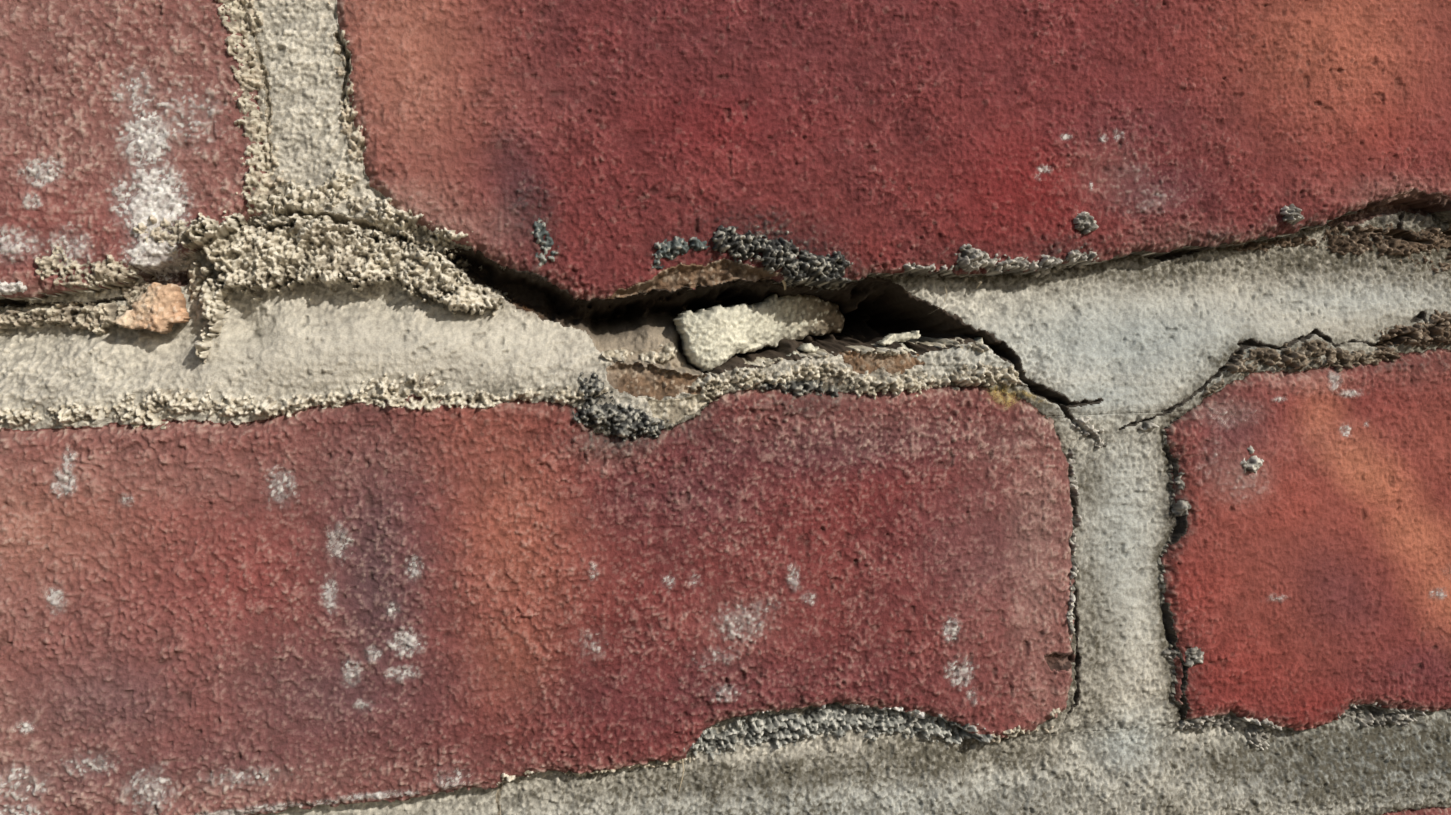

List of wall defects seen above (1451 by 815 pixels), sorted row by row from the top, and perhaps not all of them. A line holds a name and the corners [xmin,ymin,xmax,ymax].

crack [246,29,273,172]
crack [333,31,352,123]
peeling [899,262,960,278]
crack [1383,211,1451,241]
crack [274,209,1428,546]
peeling [741,336,1036,400]
crack [1063,577,1082,724]
crack [1161,602,1190,720]